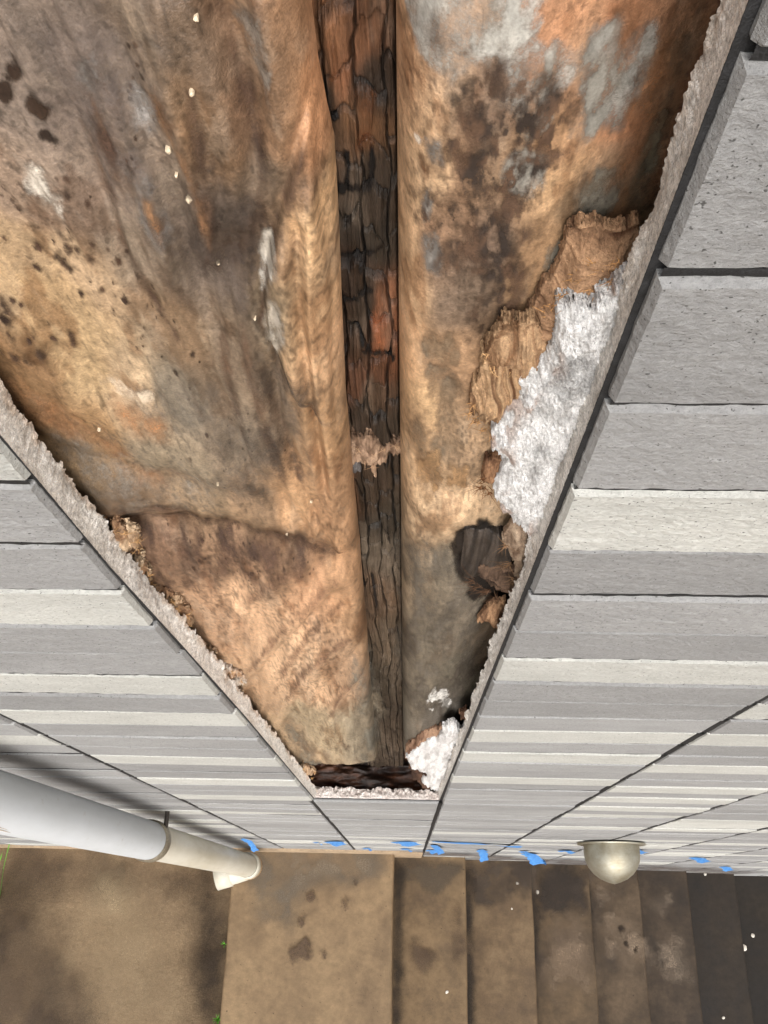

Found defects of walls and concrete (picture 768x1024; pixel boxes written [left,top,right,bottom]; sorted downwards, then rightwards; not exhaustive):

peeling [405,0,657,137]
water stain [82,63,144,177]
water stain [415,63,579,334]
peeling [503,133,546,196]
peeling [580,167,620,216]
water stain [29,228,128,274]
water stain [0,297,23,340]
water stain [2,336,46,364]
spalling [490,261,628,540]
water stain [136,506,308,590]
spalling [405,717,464,792]